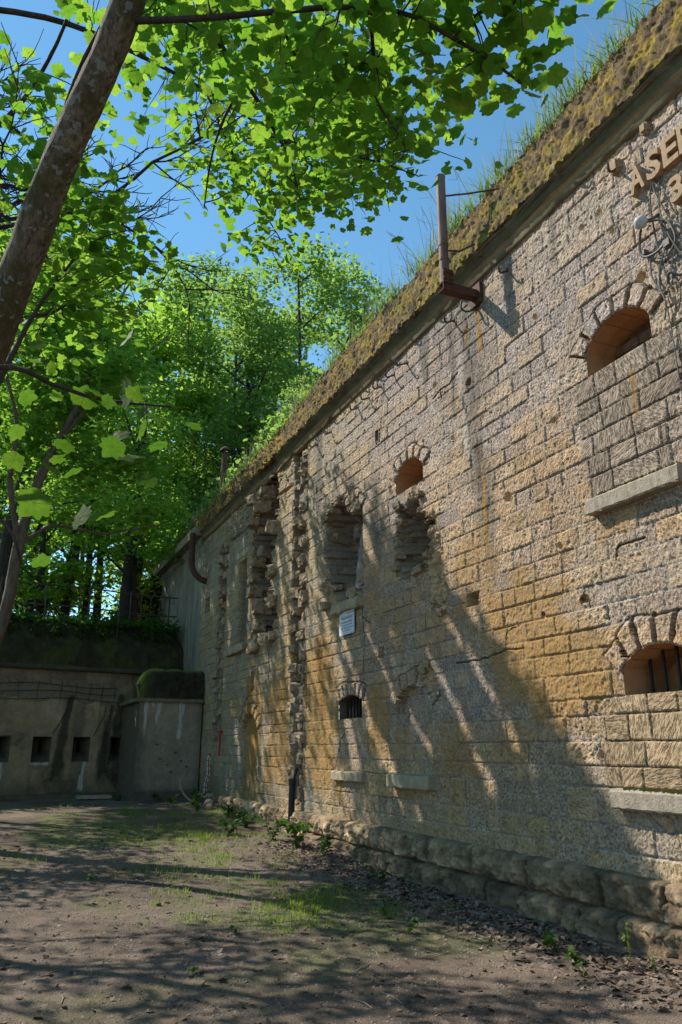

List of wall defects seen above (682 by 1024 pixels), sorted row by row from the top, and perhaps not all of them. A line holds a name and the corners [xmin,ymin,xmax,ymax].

spalling [390,490,448,616]
spalling [245,446,364,799]
crack [456,625,520,664]
damp [77,695,124,790]